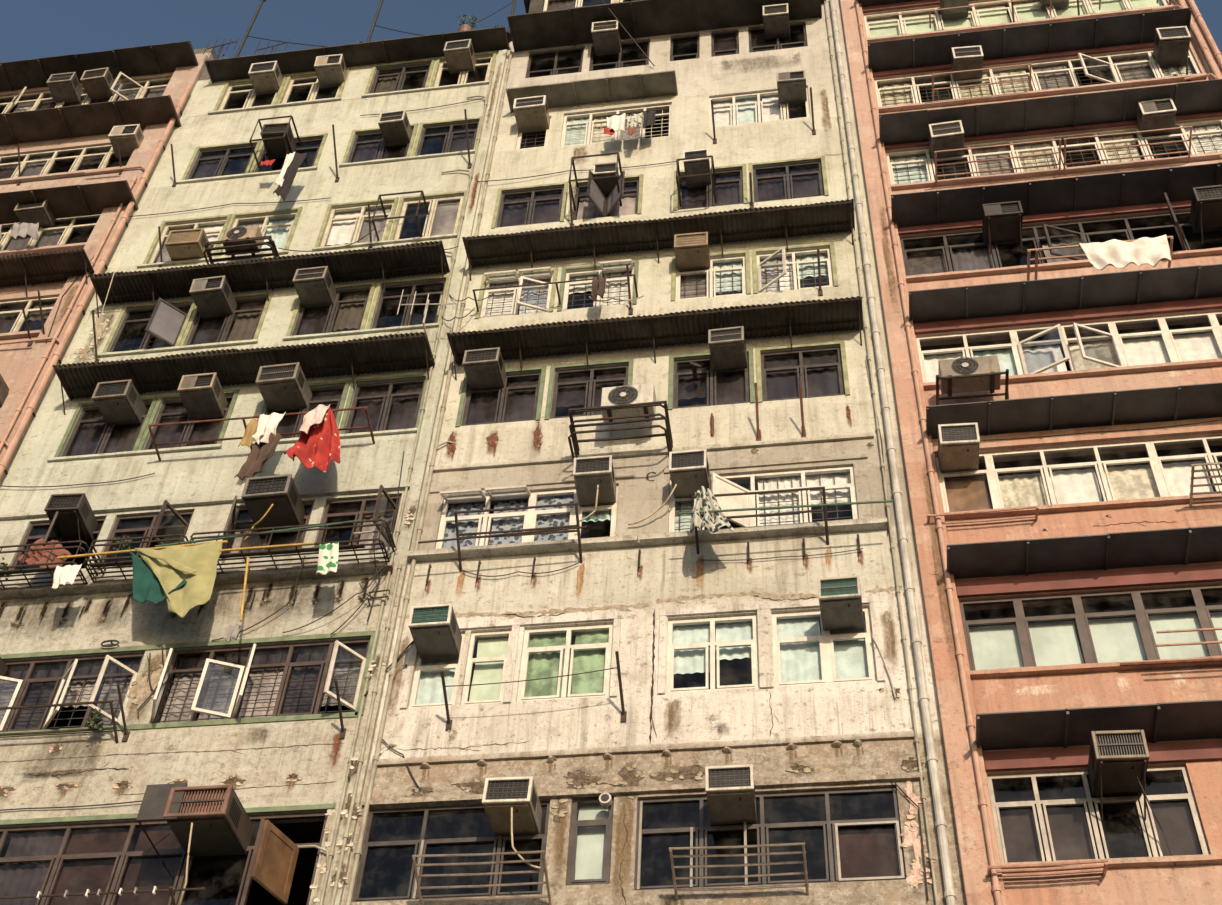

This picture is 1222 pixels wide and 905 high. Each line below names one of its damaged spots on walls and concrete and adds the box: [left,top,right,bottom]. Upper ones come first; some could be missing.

rust [447,431,457,458]
rust [485,431,499,453]
rust [533,421,543,451]
spalling [550,771,601,823]
spalling [618,762,705,799]
peeling [900,754,937,889]